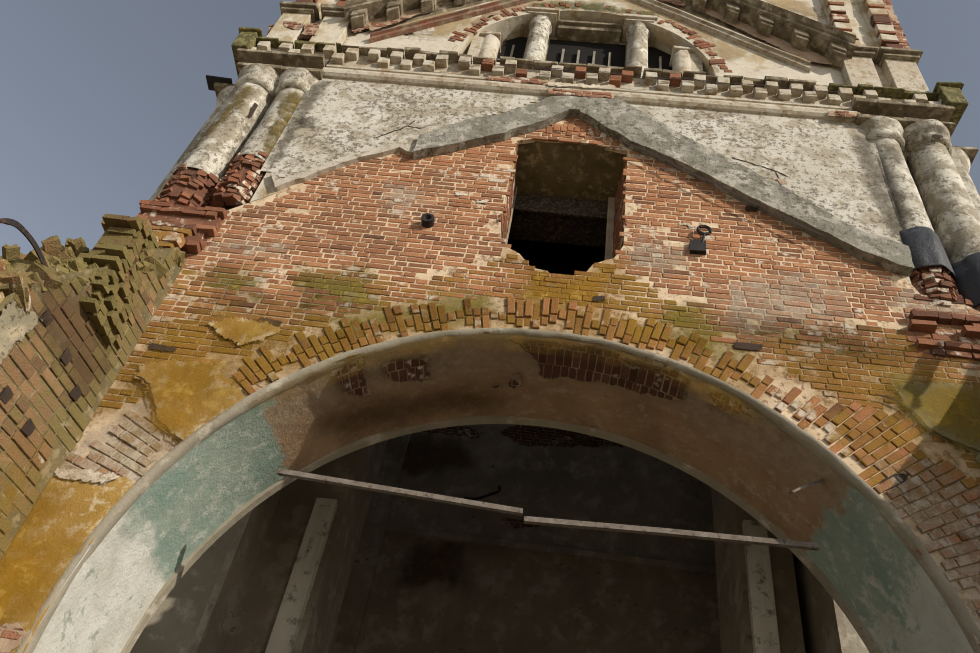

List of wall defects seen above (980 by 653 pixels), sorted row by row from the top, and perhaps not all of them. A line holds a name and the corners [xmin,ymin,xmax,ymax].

spalling [330,356,372,396]
spalling [382,357,430,383]
spalling [518,341,686,401]
leakage [859,378,980,445]
spalling [423,426,480,439]
spalling [500,425,630,448]
flaking render [54,466,119,484]
spalling [0,622,28,653]